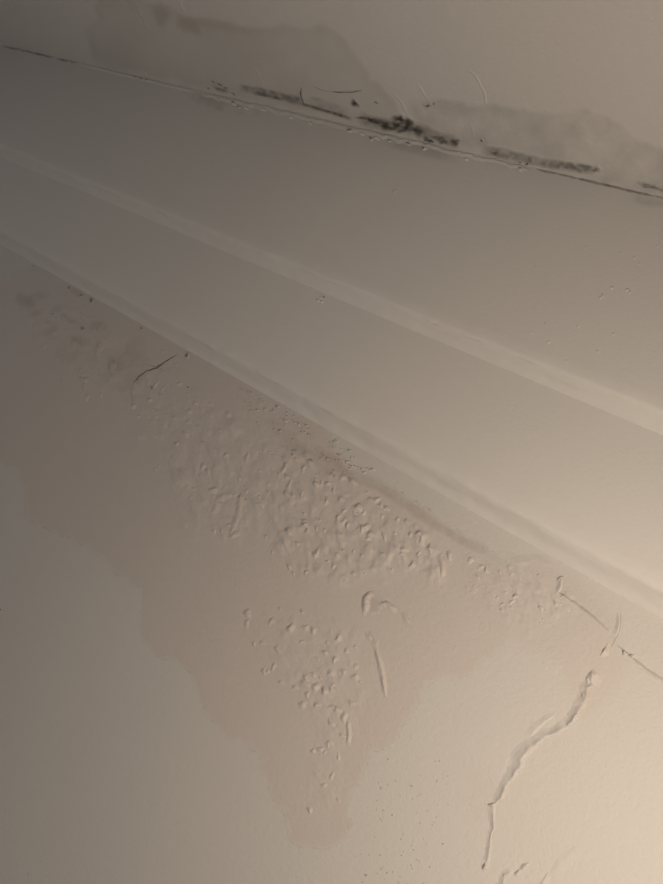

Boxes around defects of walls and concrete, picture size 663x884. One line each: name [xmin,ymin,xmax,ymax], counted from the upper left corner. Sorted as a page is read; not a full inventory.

damp [81,0,663,211]
damp [12,286,154,394]
damp [240,388,635,736]
damp [453,757,513,842]
crack [481,576,663,884]